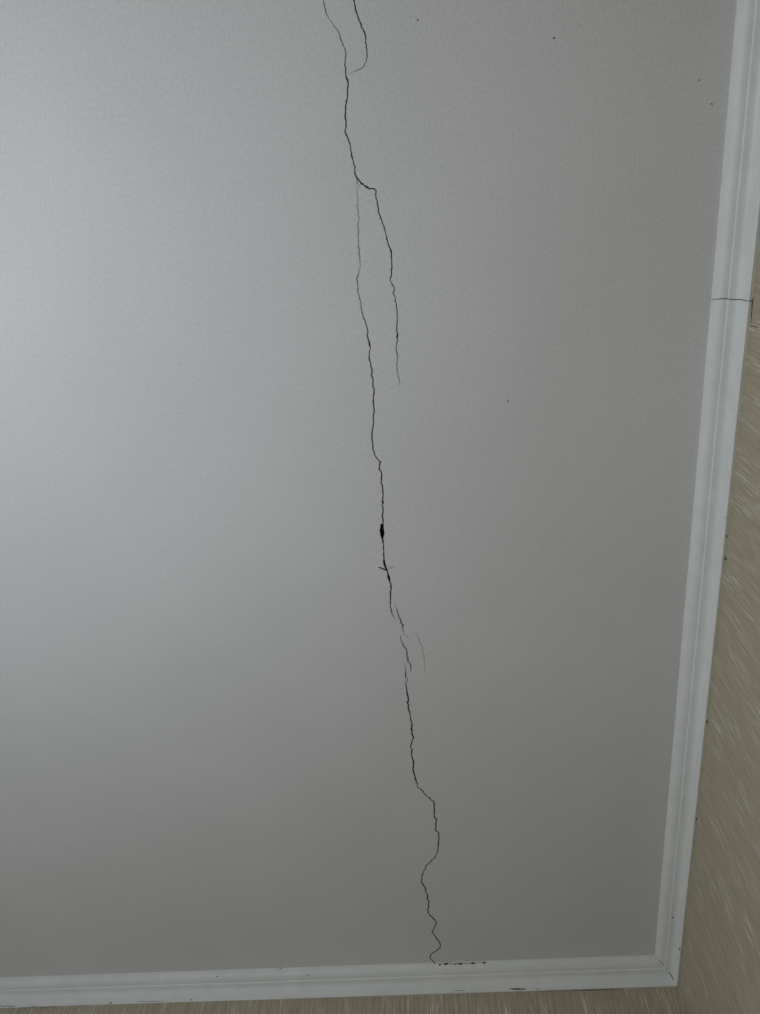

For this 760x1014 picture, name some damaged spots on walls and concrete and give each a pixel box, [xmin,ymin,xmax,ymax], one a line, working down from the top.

crack [323,0,486,966]